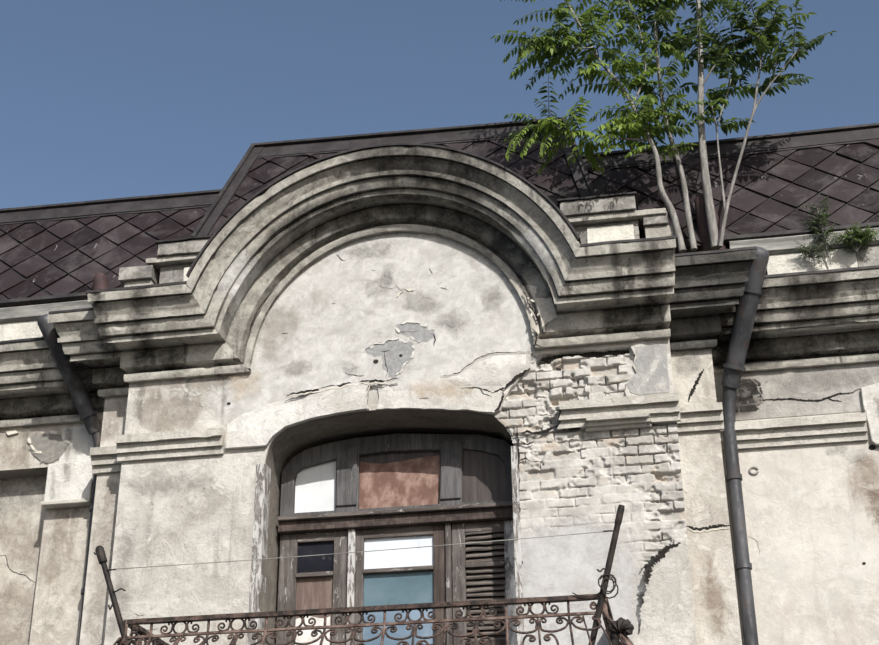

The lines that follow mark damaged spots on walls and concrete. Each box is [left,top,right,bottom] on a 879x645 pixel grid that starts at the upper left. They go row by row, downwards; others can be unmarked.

water stain [267,146,557,278]
water stain [218,254,260,305]
water stain [605,239,664,333]
crack [287,340,397,409]
peeling [366,321,435,378]
crack [445,351,530,411]
crack [688,369,704,402]
crack [760,389,858,402]
peeling [6,430,70,463]
flaking render [495,348,688,569]
crack [636,524,731,634]